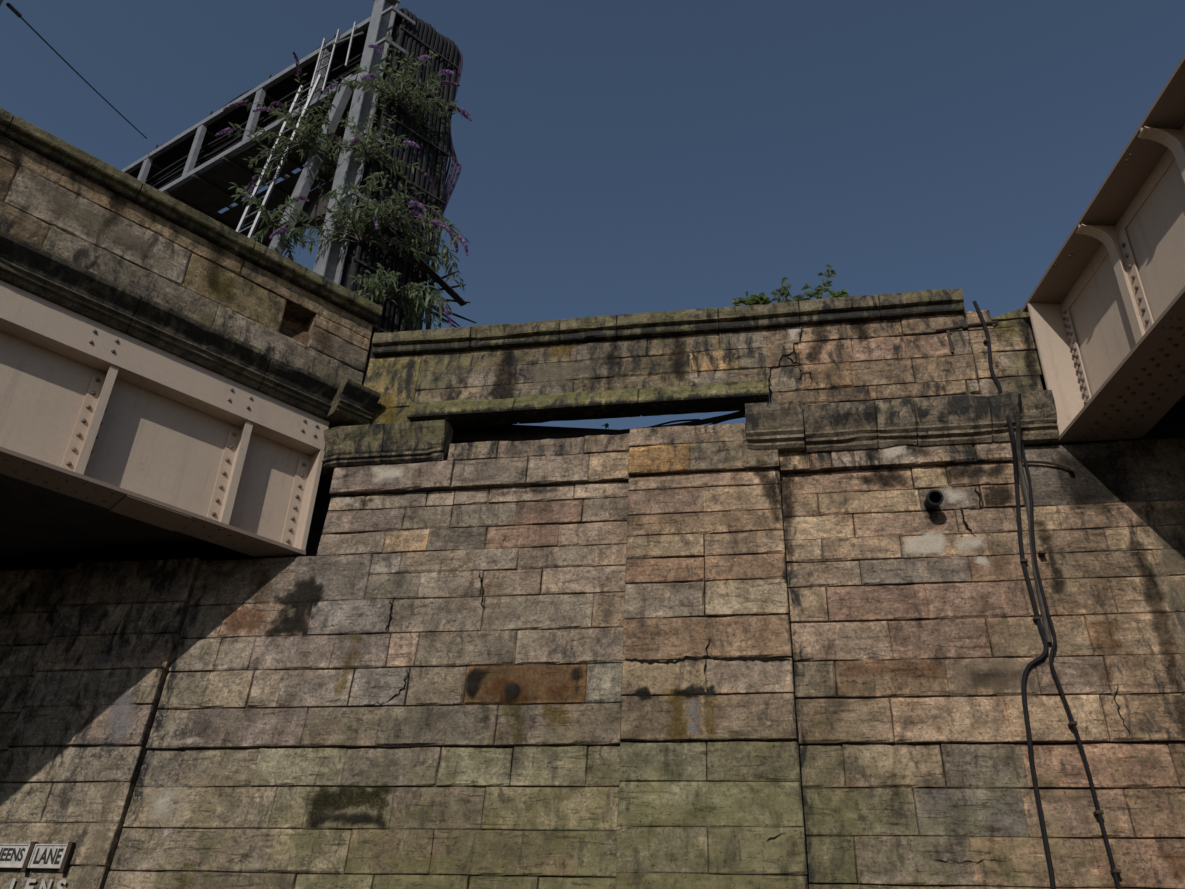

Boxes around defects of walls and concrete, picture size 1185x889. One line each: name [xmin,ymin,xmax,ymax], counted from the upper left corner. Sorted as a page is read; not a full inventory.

crack [768,326,812,398]
water stain [1139,479,1185,672]
crack [625,638,791,674]